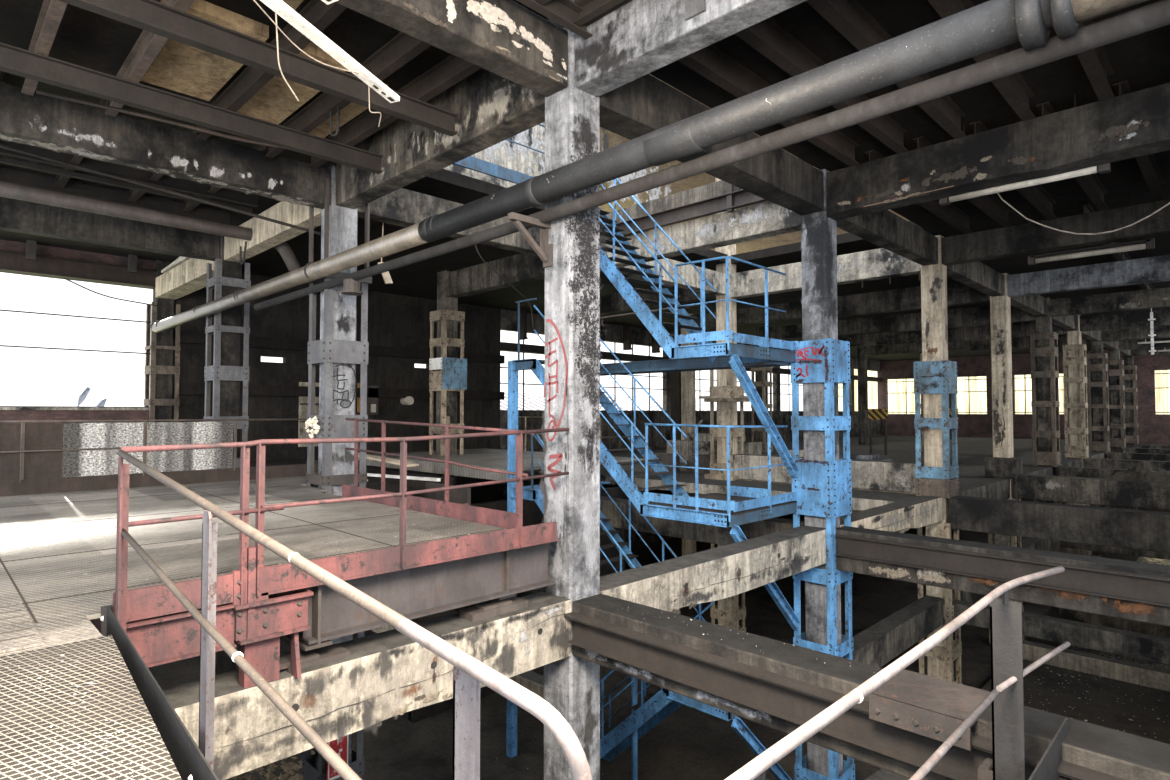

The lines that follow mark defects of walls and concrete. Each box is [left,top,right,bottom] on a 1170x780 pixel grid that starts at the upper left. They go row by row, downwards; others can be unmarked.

peeling [403,0,567,84]
spalling [1097,116,1161,141]
spalling [837,156,992,207]
leakage [438,605,571,675]
leakage [213,647,443,780]